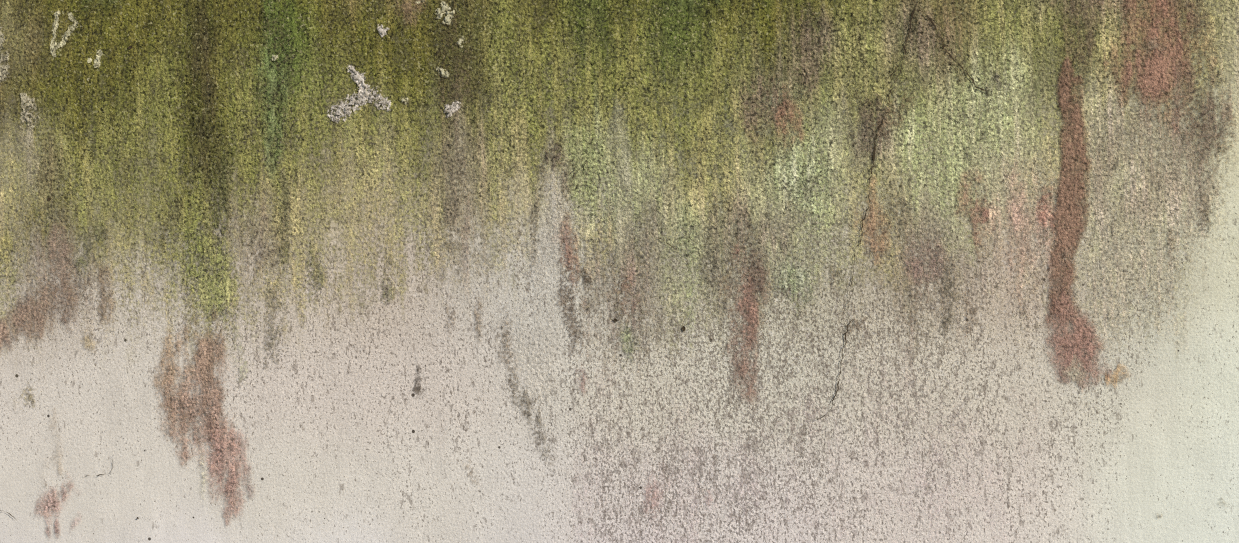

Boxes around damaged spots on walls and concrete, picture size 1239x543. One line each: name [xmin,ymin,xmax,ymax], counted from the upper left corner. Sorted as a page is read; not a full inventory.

leakage [161,0,236,318]
leakage [249,38,290,269]
leakage [499,112,528,169]
leakage [531,109,634,283]
leakage [775,139,829,214]
leakage [796,0,964,159]
crack [815,0,986,419]
corrosion [962,0,1121,387]
corrosion [1114,0,1231,141]
corrosion [155,336,251,524]
leakage [498,319,554,455]
leakage [549,288,584,343]